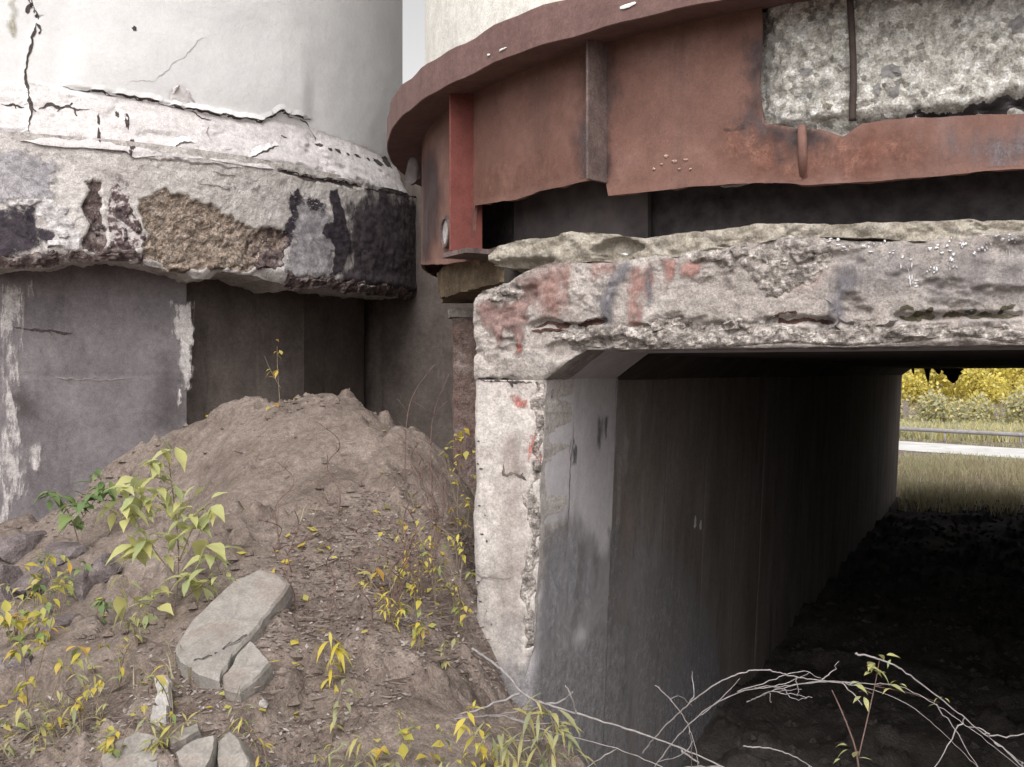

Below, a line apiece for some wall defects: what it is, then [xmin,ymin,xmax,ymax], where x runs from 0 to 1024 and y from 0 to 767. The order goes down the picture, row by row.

crack [2,0,87,133]
crack [133,37,205,82]
spalling [760,0,1024,136]
water stain [0,281,41,523]
spalling [0,148,416,299]
spalling [685,235,834,298]
spalling [551,316,1024,353]
spalling [520,382,554,648]